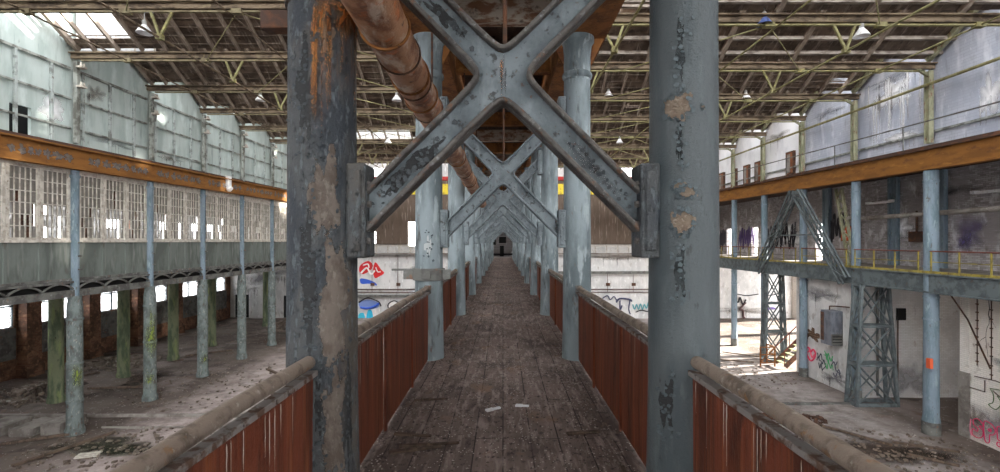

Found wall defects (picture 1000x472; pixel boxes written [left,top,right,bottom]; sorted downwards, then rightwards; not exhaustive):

rust [311,0,357,79]
peeling [661,11,706,171]
peeling [286,11,356,472]
peeling [668,183,698,306]
peeling [655,369,681,441]